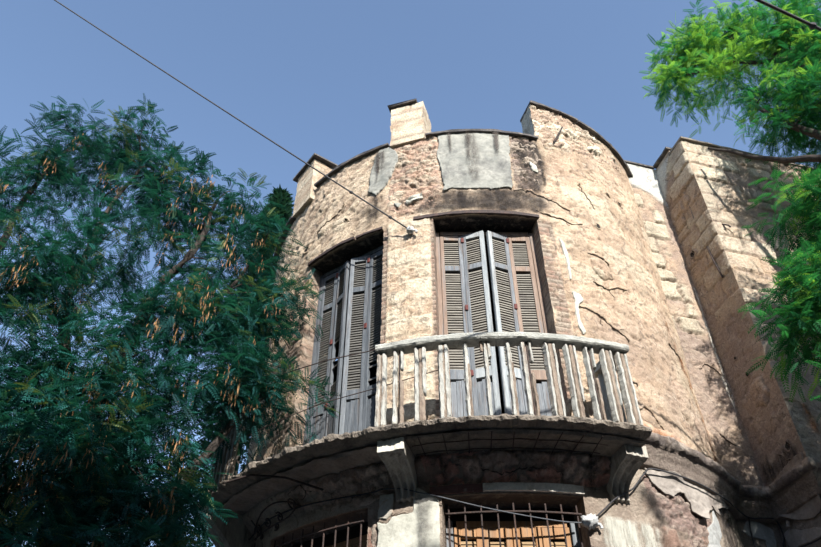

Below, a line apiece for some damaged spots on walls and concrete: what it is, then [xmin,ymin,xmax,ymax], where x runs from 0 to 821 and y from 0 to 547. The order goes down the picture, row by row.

crack [514,182,595,226]
crack [588,252,610,265]
crack [594,281,627,298]
crack [579,305,630,342]
spalling [371,431,611,547]
flaking render [642,468,728,547]
flaking render [742,489,821,547]